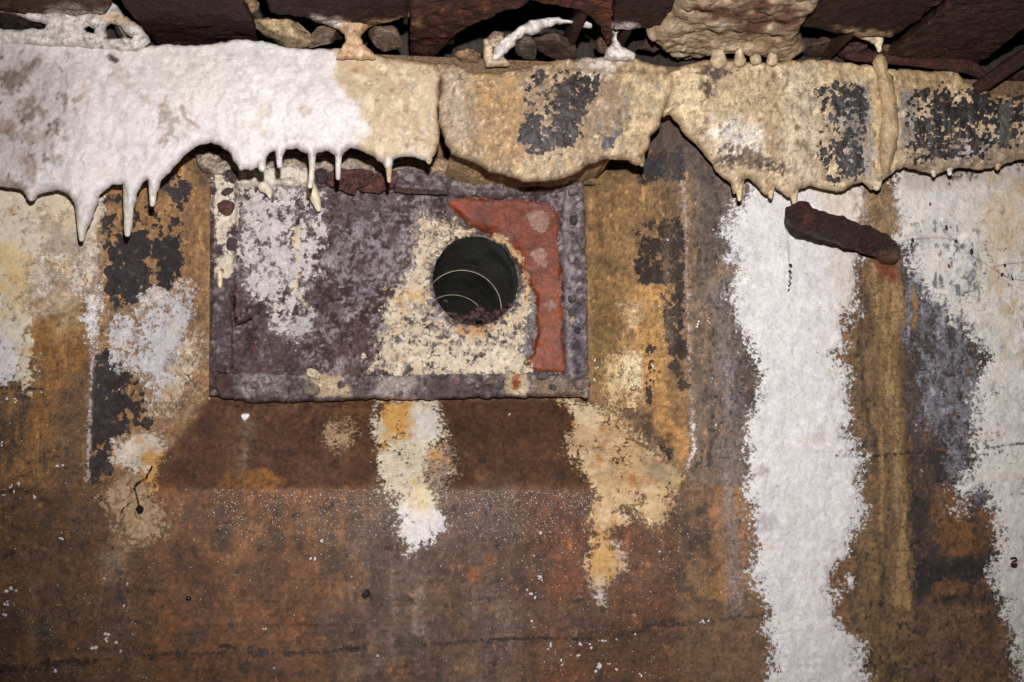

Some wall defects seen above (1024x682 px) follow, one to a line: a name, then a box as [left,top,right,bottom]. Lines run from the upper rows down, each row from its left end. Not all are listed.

rust [325,169,448,195]
rust [860,185,899,233]
efflorescence [369,399,459,560]
efflorescence [556,174,698,614]
rust [868,255,919,612]